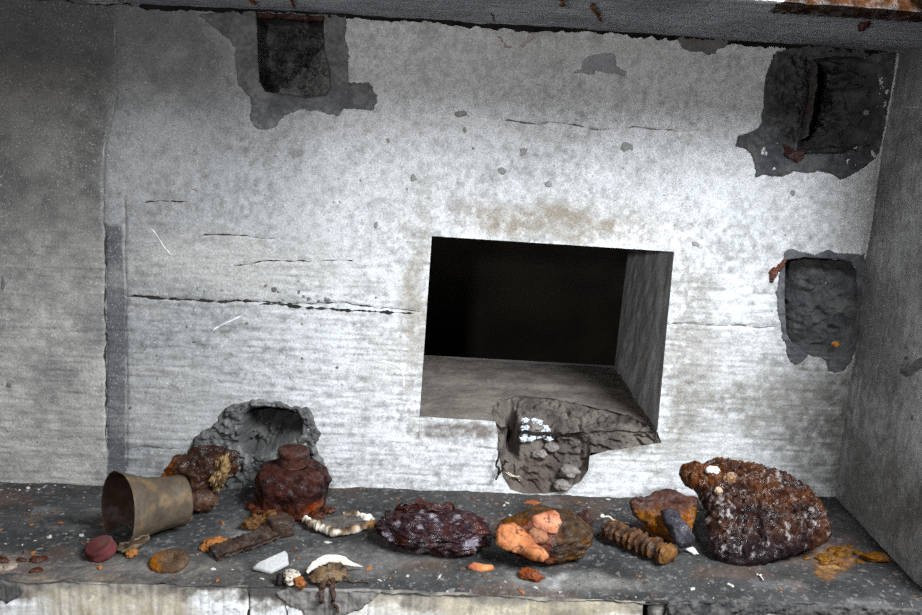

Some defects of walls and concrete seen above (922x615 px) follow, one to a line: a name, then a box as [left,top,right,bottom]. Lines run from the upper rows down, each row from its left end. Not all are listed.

spalling [199,11,377,130]
crack [138,4,886,57]
crack [502,119,604,130]
peeling [573,53,627,77]
crack [629,125,676,133]
spalling [735,46,896,180]
crack [102,6,420,455]
crack [669,321,778,329]
spalling [768,249,865,373]
spalling [184,399,325,489]